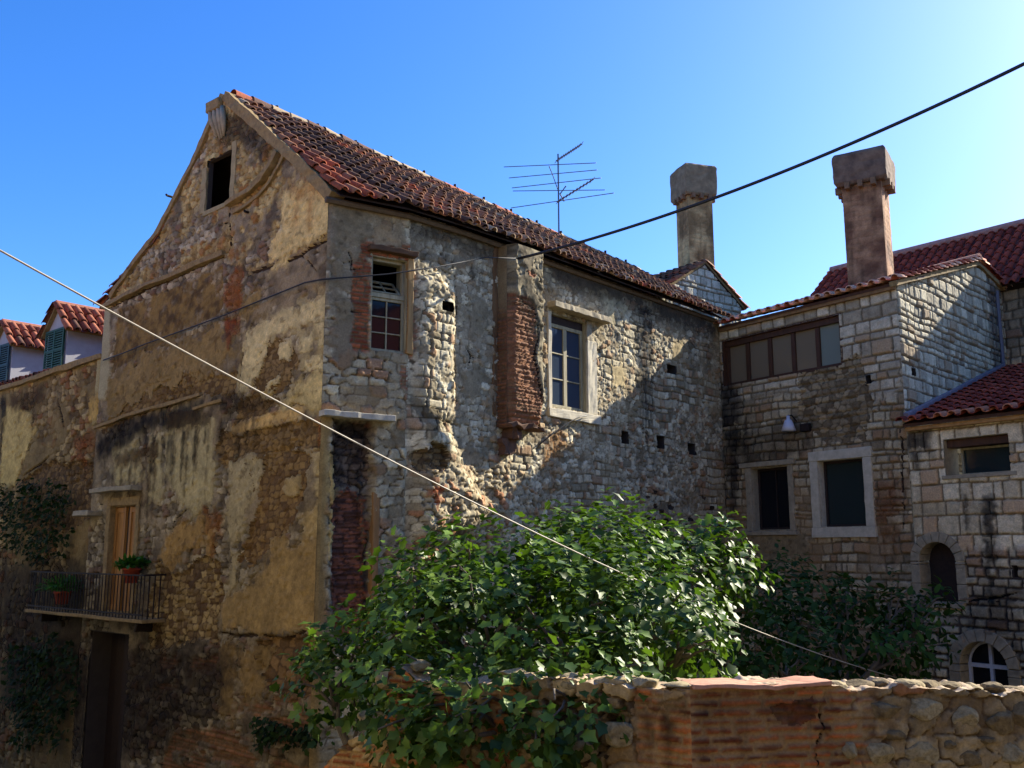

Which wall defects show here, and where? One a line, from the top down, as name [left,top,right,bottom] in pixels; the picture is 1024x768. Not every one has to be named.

flaking render [268,183,328,271]
spalling [0,404,94,538]
leakage [97,394,246,505]
flaking render [88,288,371,718]
spalling [408,440,483,473]
leakage [983,498,998,603]
crack [815,713,825,766]